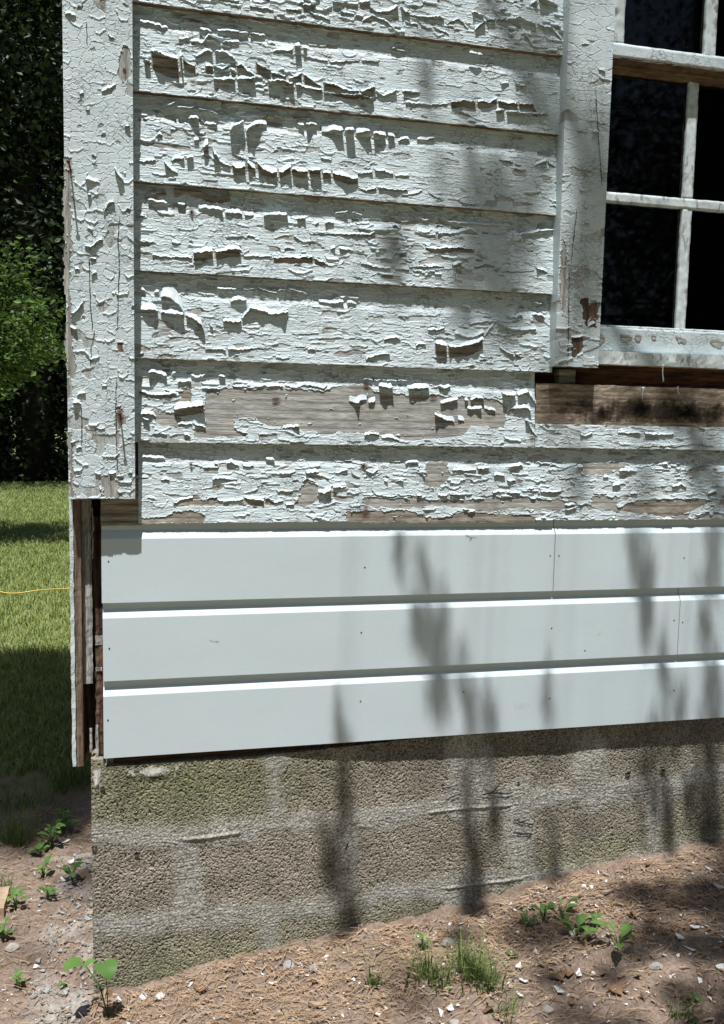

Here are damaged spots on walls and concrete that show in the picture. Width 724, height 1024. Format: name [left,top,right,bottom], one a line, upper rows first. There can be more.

peeling [332,0,561,48]
peeling [144,27,548,117]
peeling [161,99,435,194]
peeling [146,186,306,219]
peeling [62,157,103,404]
peeling [136,284,307,333]
peeling [137,209,375,269]
peeling [361,213,577,316]
peeling [416,294,544,358]
peeling [139,366,537,441]
leakage [562,397,724,424]
peeling [142,458,717,524]